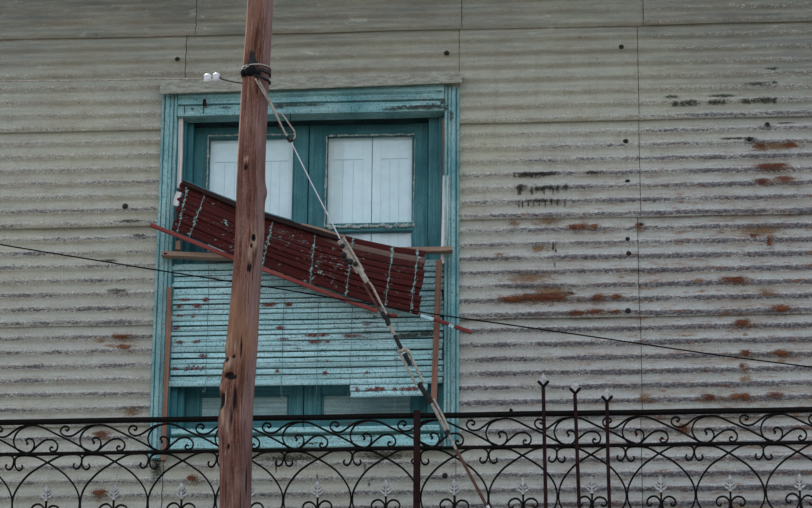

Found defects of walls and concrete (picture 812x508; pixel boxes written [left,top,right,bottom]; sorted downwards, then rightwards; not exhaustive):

corrosion [753,141,804,151]
corrosion [755,163,793,186]
corrosion [499,275,567,307]
peeling [173,297,209,330]
corrosion [568,294,625,319]
corrosion [96,334,135,349]
corrosion [702,392,785,404]